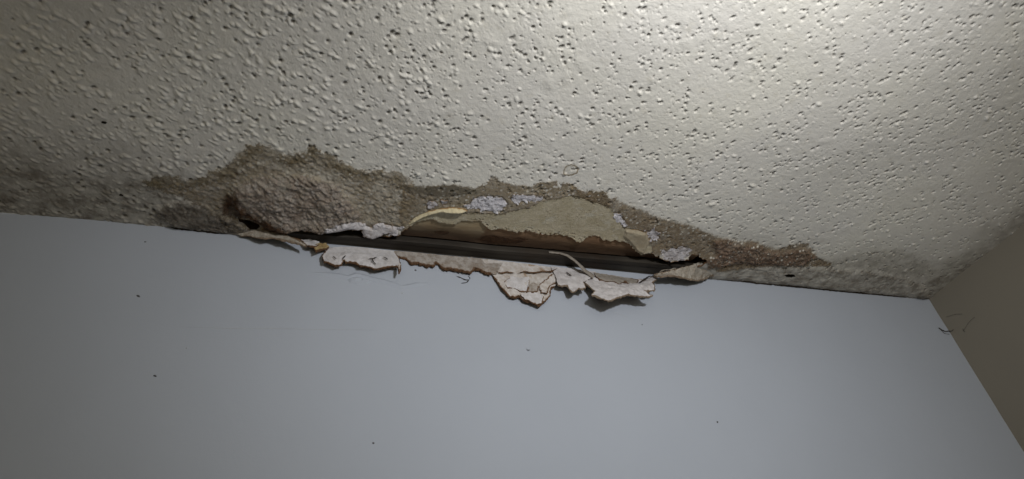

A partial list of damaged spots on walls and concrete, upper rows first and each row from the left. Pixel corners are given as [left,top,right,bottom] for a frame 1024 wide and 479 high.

peeling [236,194,714,307]
leakage [143,144,831,272]